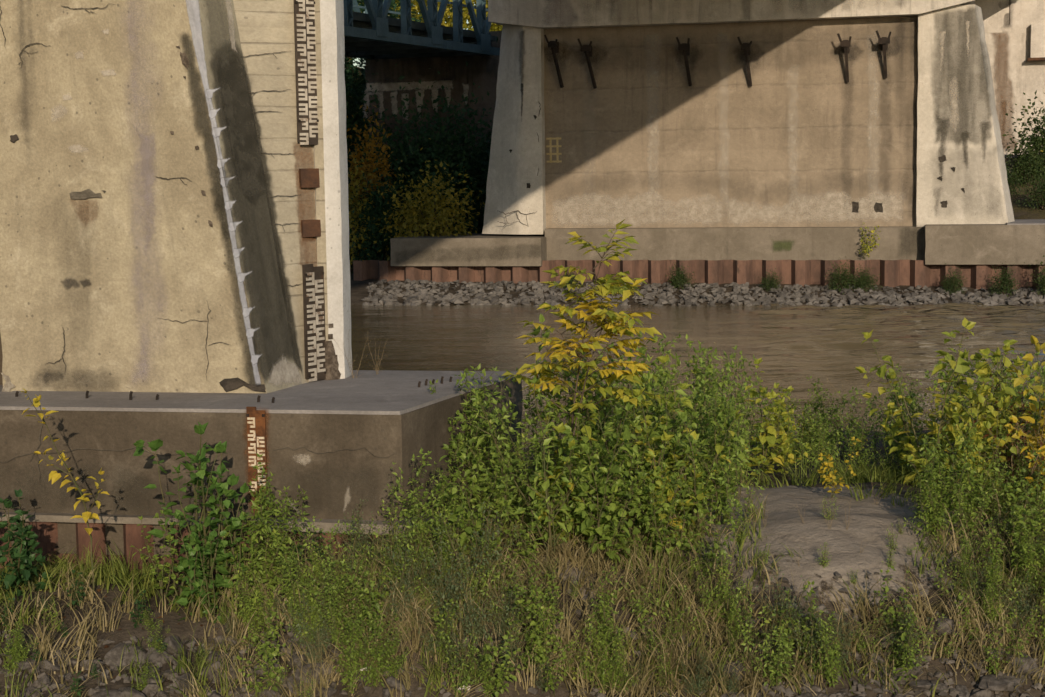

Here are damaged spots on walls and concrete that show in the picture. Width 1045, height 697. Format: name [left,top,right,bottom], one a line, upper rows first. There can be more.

crack [63,3,114,13]
crack [0,9,50,67]
water stain [936,5,1016,169]
spalling [69,189,106,200]
water stain [182,0,302,385]
crack [497,210,537,227]
crack [46,329,66,370]
crack [160,300,230,378]